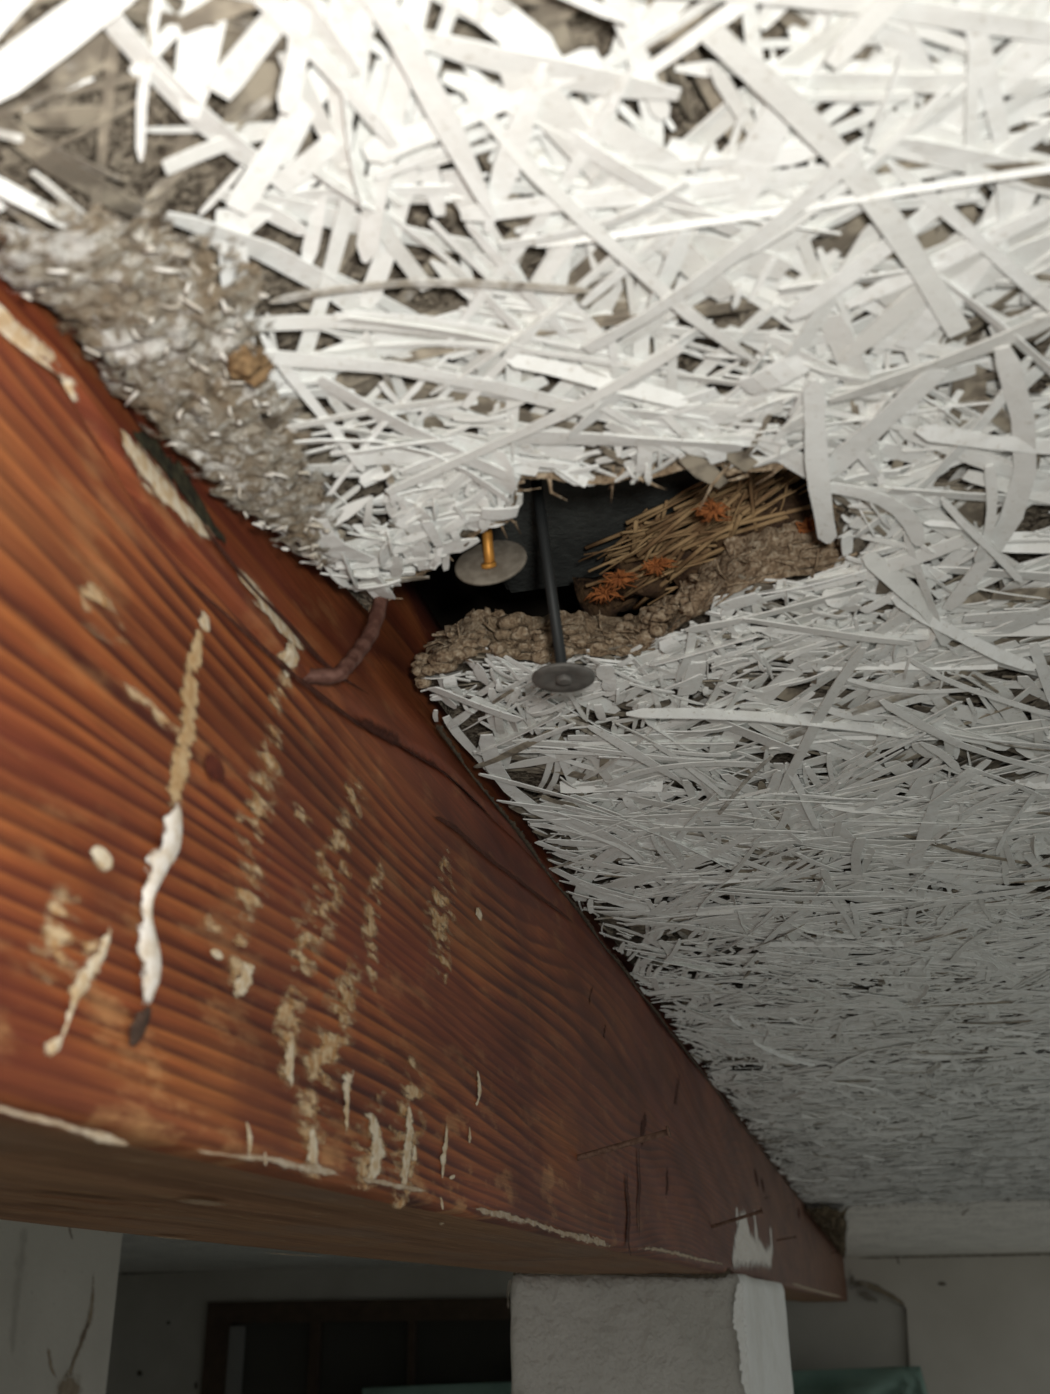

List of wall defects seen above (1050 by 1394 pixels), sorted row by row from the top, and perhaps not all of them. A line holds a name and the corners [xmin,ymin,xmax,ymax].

spalling [587,461,686,485]
spalling [706,459,788,476]
spalling [464,472,569,538]
spalling [418,497,850,678]
peeling [200,1151,338,1175]